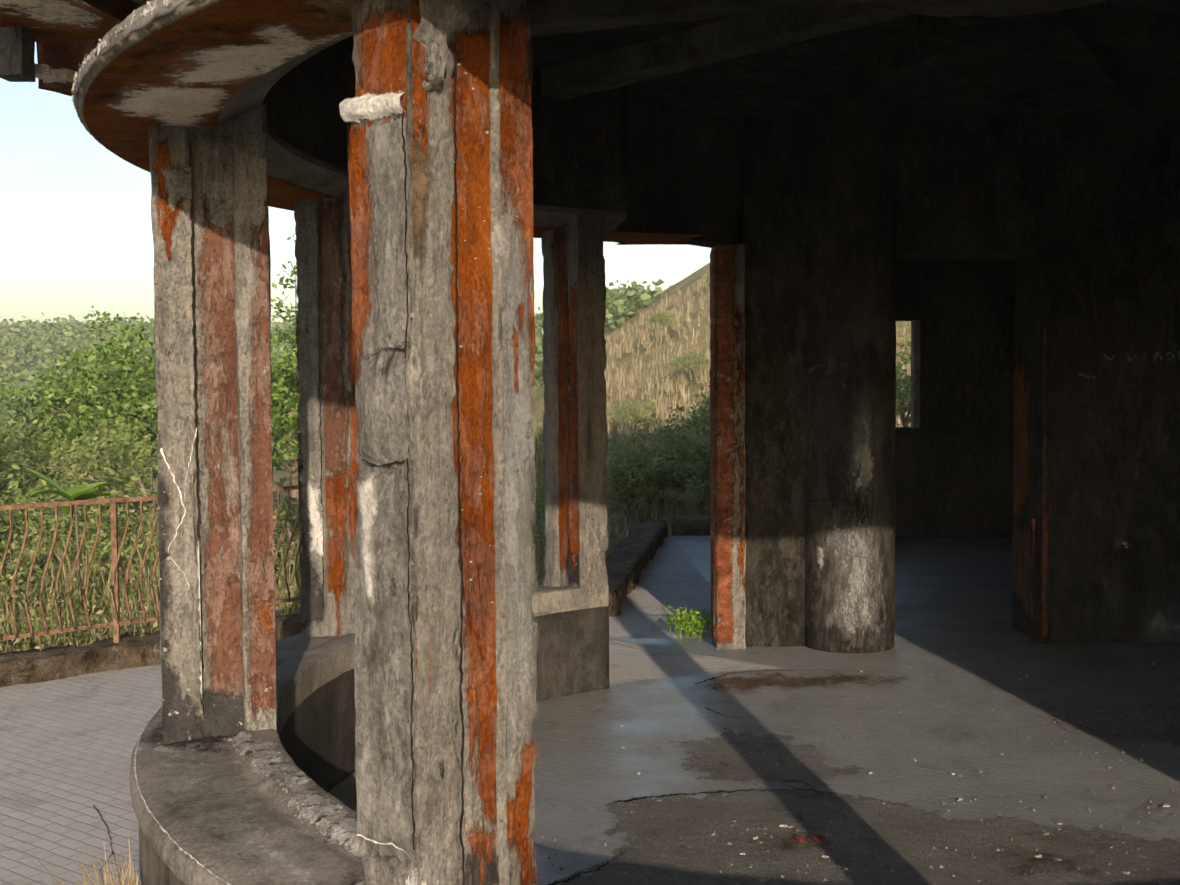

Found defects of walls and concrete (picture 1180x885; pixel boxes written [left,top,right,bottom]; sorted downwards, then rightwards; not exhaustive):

peeling [71,0,182,128]
crack [160,138,203,715]
rust [83,0,431,719]
spalling [200,468,419,868]
crack [357,107,415,857]
spalling [411,0,469,93]
rust [450,5,580,885]
rust [603,231,703,245]
rust [1030,298,1050,644]